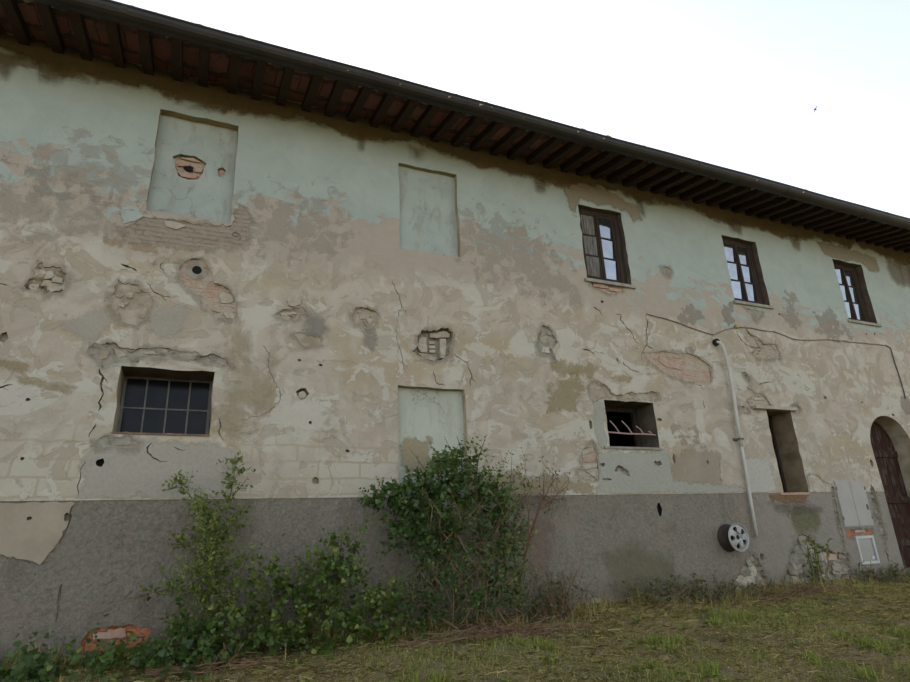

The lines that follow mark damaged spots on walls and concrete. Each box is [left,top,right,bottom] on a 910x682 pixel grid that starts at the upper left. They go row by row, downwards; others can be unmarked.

spalling [173,154,206,180]
spalling [24,262,67,294]
spalling [120,203,251,319]
spalling [87,342,230,369]
spalling [413,327,453,362]
crack [583,307,653,372]
crack [89,369,108,435]
spalling [581,441,629,481]
crack [0,460,86,566]
spalling [779,474,887,585]
spalling [733,554,768,590]
crack [54,584,62,622]